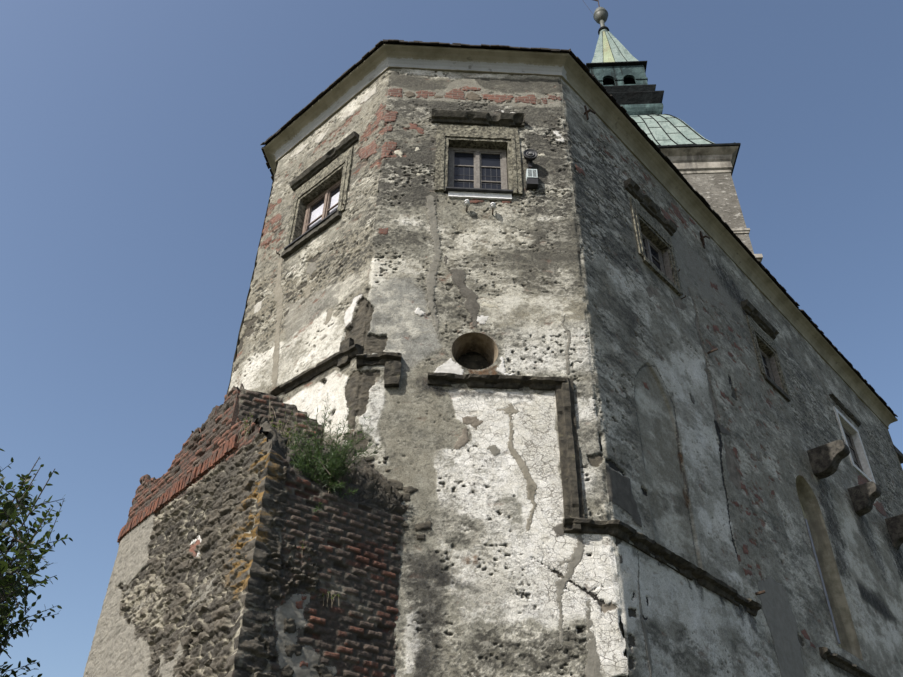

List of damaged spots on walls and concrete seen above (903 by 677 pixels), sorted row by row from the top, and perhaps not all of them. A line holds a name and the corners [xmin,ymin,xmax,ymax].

spalling [343,294,388,354]
spalling [345,370,380,453]
flaking render [189,534,202,561]
crack [496,403,653,677]
flaking render [275,593,337,677]
damp [416,562,457,677]